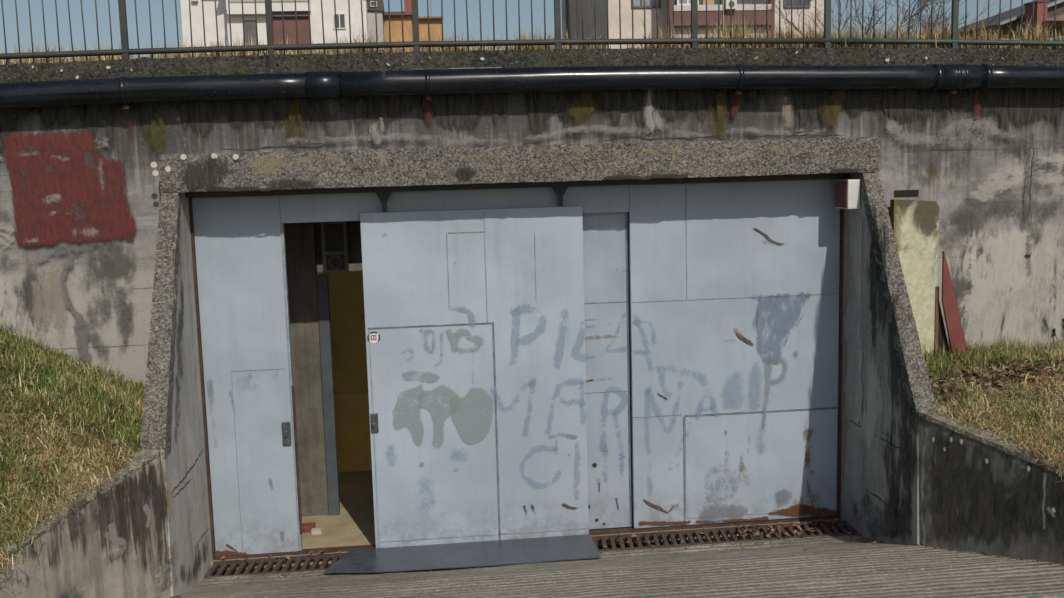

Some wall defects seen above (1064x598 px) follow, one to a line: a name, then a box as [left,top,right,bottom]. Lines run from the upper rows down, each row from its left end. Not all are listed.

peeling [46,194,87,223]
water stain [183,157,228,191]
water stain [0,93,508,169]
water stain [453,167,475,181]
water stain [525,89,1064,275]
water stain [13,267,43,329]
water stain [86,242,135,355]
water stain [853,209,1064,550]
water stain [4,453,208,591]
crack [170,450,209,557]